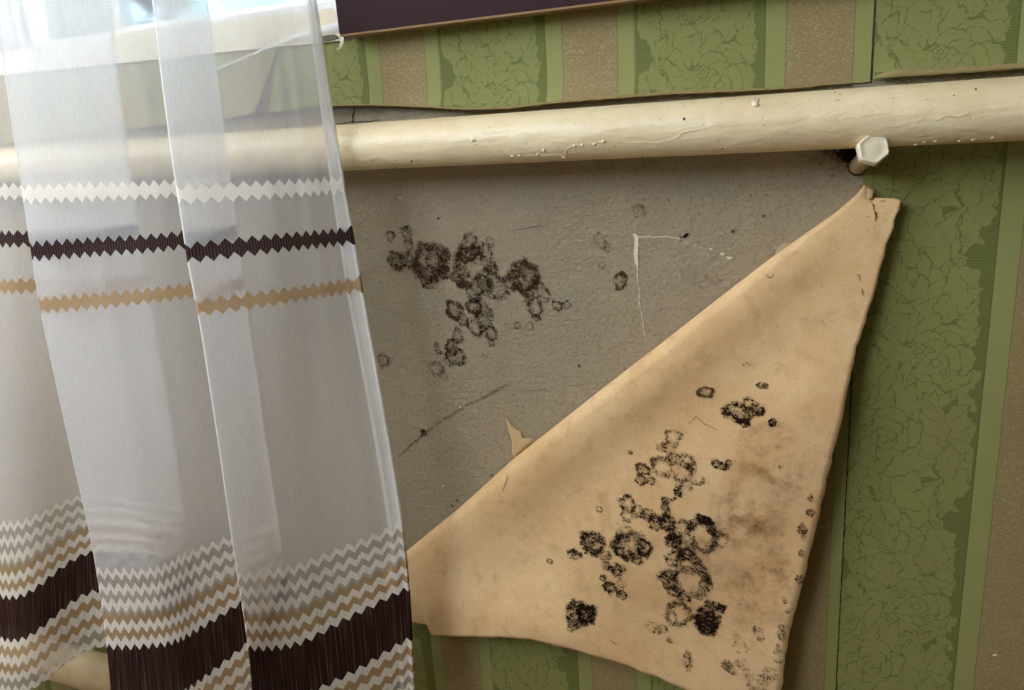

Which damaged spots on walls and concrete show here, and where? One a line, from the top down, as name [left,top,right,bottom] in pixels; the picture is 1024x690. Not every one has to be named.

mould [386,225,571,379]
mould [696,386,777,428]
mould [566,429,740,643]
mould [797,493,815,556]
mould [721,624,786,690]